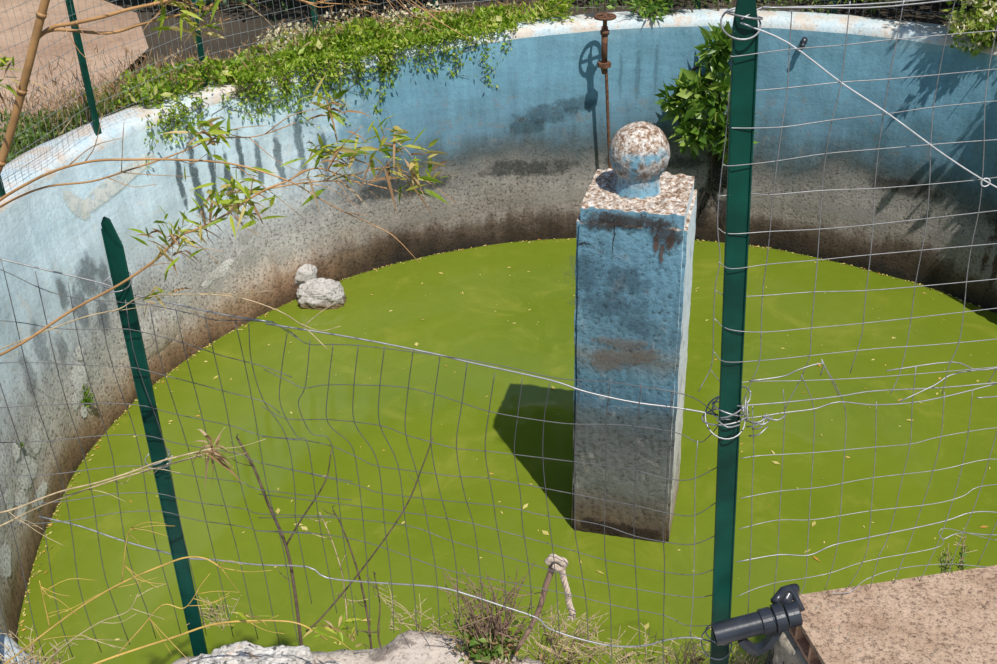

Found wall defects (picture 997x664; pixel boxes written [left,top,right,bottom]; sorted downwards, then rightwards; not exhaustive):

water stain [492,161,569,176]
water stain [361,177,448,199]
water stain [872,177,935,198]
rust [653,236,675,262]